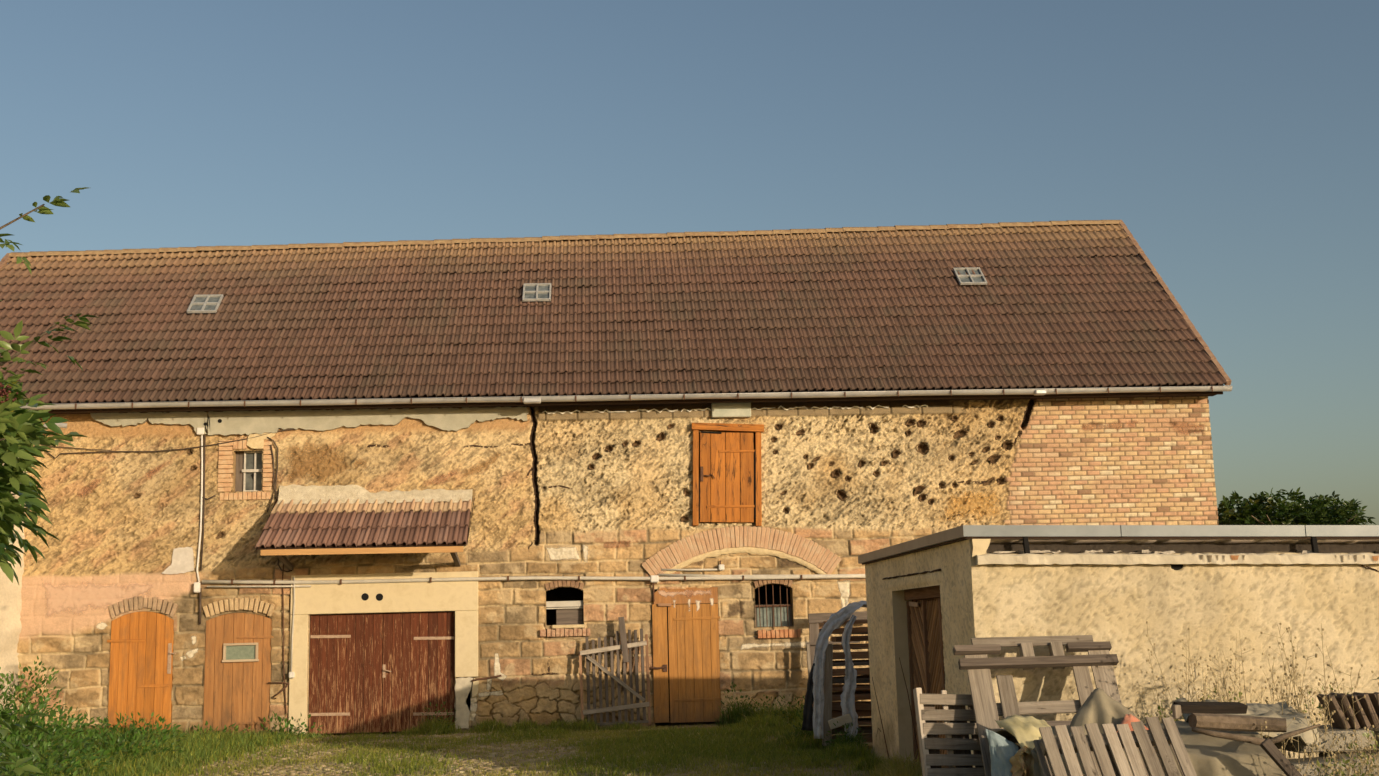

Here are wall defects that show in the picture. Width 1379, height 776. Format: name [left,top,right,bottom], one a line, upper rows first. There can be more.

crack [464,407,572,549]
spalling [752,405,930,501]
spalling [913,415,1014,505]
crack [1014,399,1034,446]